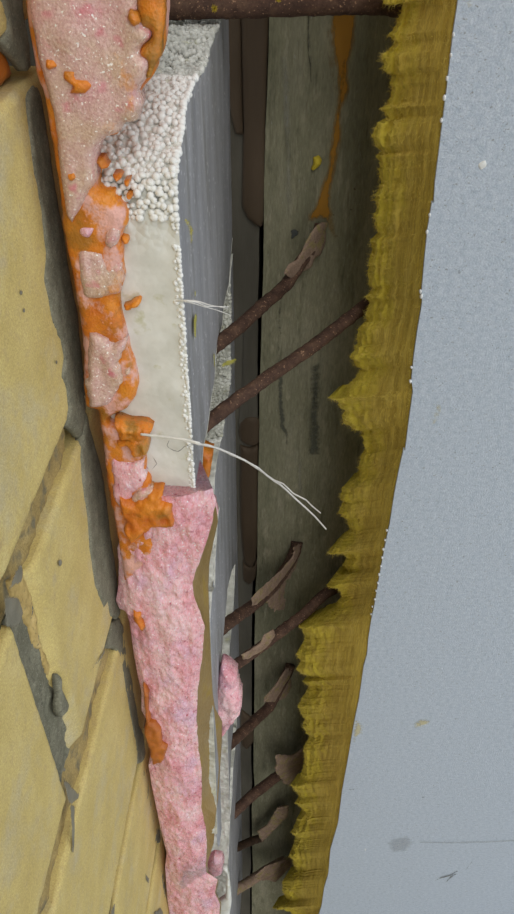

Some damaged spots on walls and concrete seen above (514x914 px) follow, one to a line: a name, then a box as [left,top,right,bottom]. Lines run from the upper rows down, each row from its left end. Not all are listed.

corrosion [311,15,355,231]
spalling [205,419,225,493]
spalling [208,505,219,618]
spalling [225,565,235,617]
spalling [211,629,232,669]
spalling [209,706,237,898]